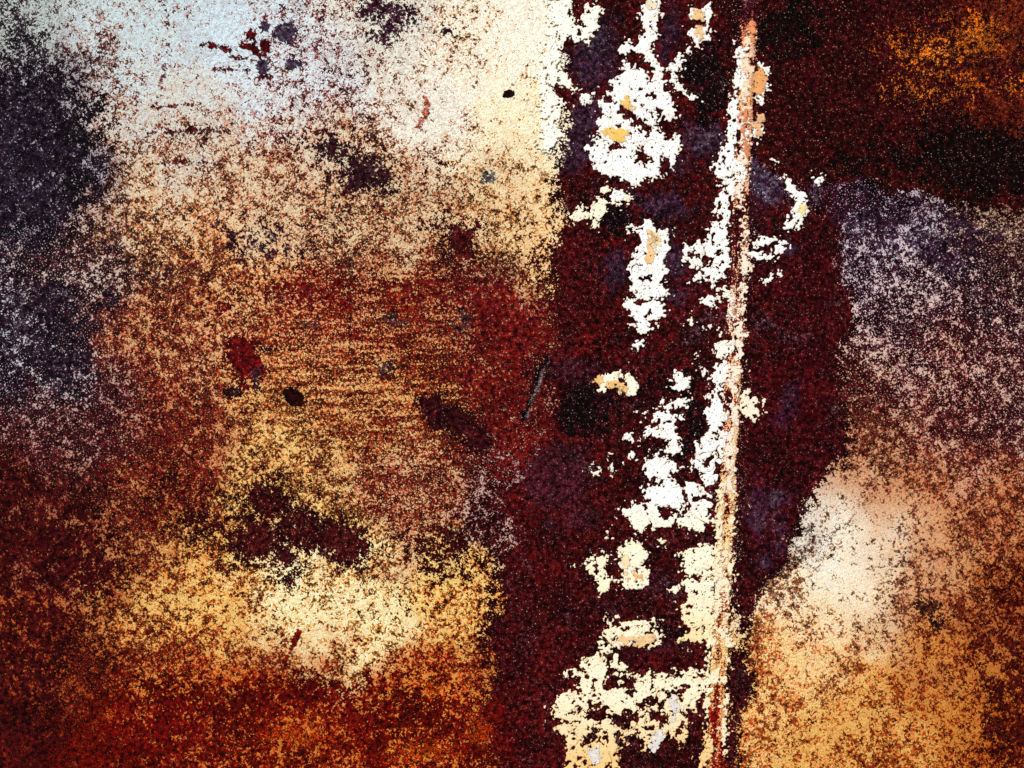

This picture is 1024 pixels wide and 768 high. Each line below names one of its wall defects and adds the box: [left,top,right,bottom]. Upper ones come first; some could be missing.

rust [0,0,743,768]
peeling [530,0,810,768]
rust [716,0,1024,768]